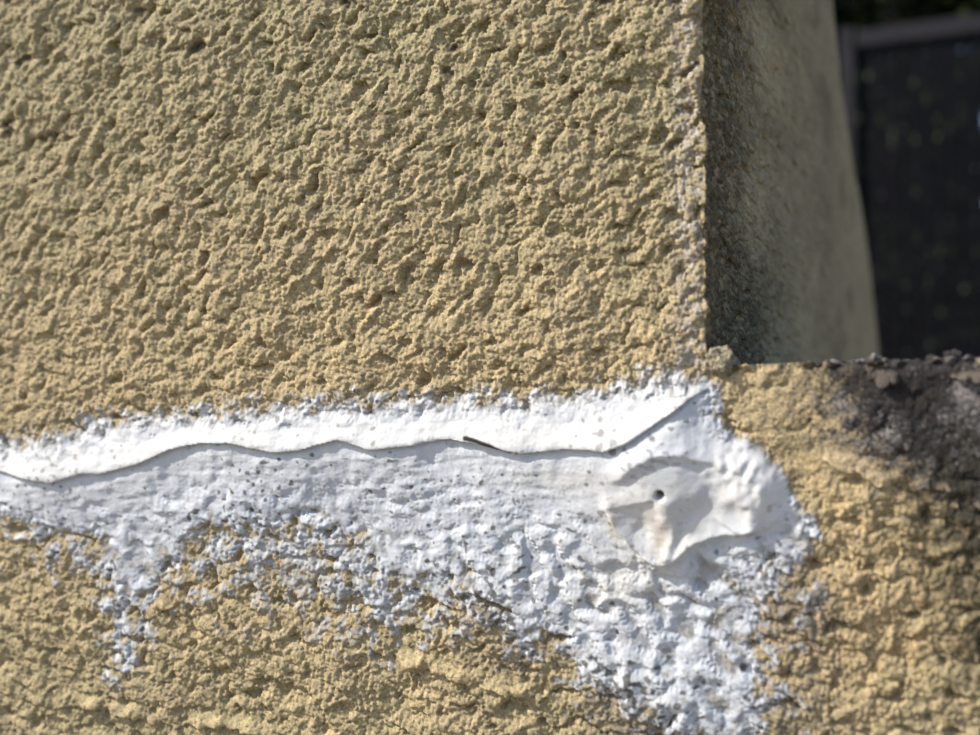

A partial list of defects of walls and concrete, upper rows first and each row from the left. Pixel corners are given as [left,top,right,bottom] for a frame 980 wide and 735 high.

water stain [808,353,980,657]